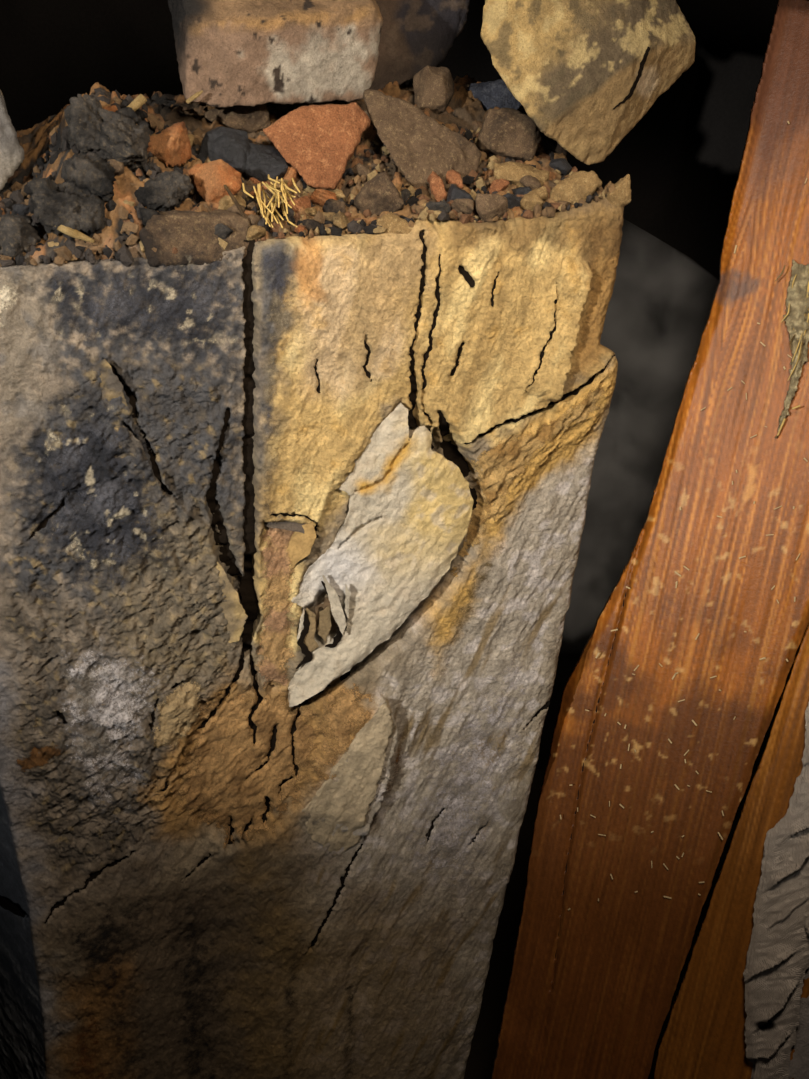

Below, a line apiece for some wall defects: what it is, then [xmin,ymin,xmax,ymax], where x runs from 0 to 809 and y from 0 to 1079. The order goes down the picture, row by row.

crack [313,359,321,393]
crack [363,340,372,382]
crack [408,232,615,463]
crack [102,358,173,495]
crack [186,240,318,877]
crack [149,681,183,732]
crack [523,701,550,730]
crack [425,808,445,842]
crack [0,851,134,924]